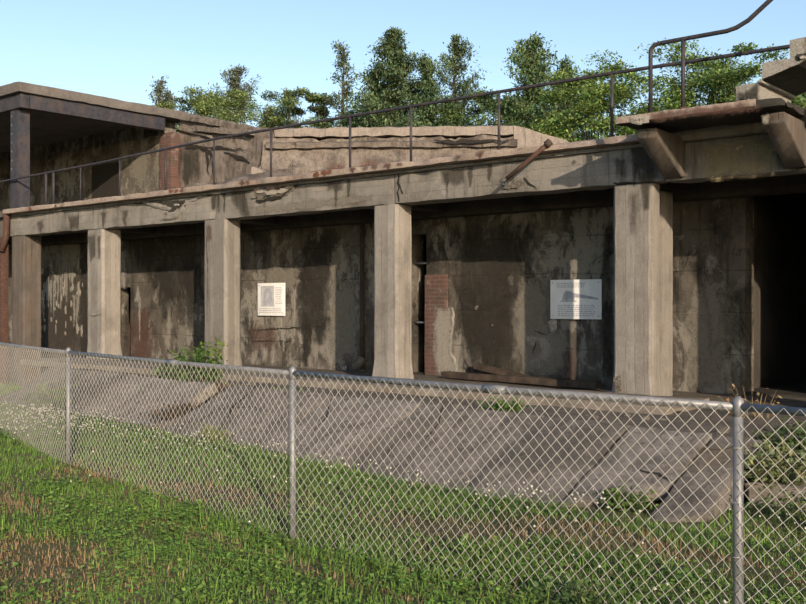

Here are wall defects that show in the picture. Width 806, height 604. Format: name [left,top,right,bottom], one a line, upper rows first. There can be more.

spalling [156,200,185,212]
peeling [41,258,87,358]
leakage [262,235,359,370]
leakage [455,222,575,379]
leakage [603,227,613,376]
crack [219,386,262,430]
crack [638,469,671,481]